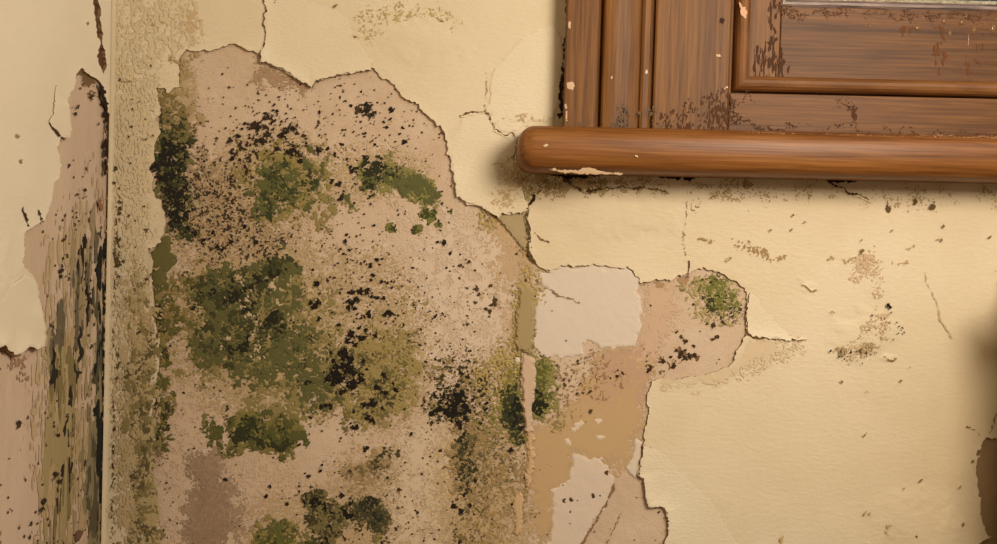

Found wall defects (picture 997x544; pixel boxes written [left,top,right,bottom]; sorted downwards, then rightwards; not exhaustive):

water stain [72,70,98,116]
crack [93,0,133,175]
crack [557,1,566,119]
water stain [850,183,960,213]
spalling [0,69,108,544]
water stain [7,166,107,544]
spalling [149,0,792,544]
water stain [106,0,838,544]
mould [830,303,905,364]
crack [925,272,953,339]
spalling [976,437,997,544]